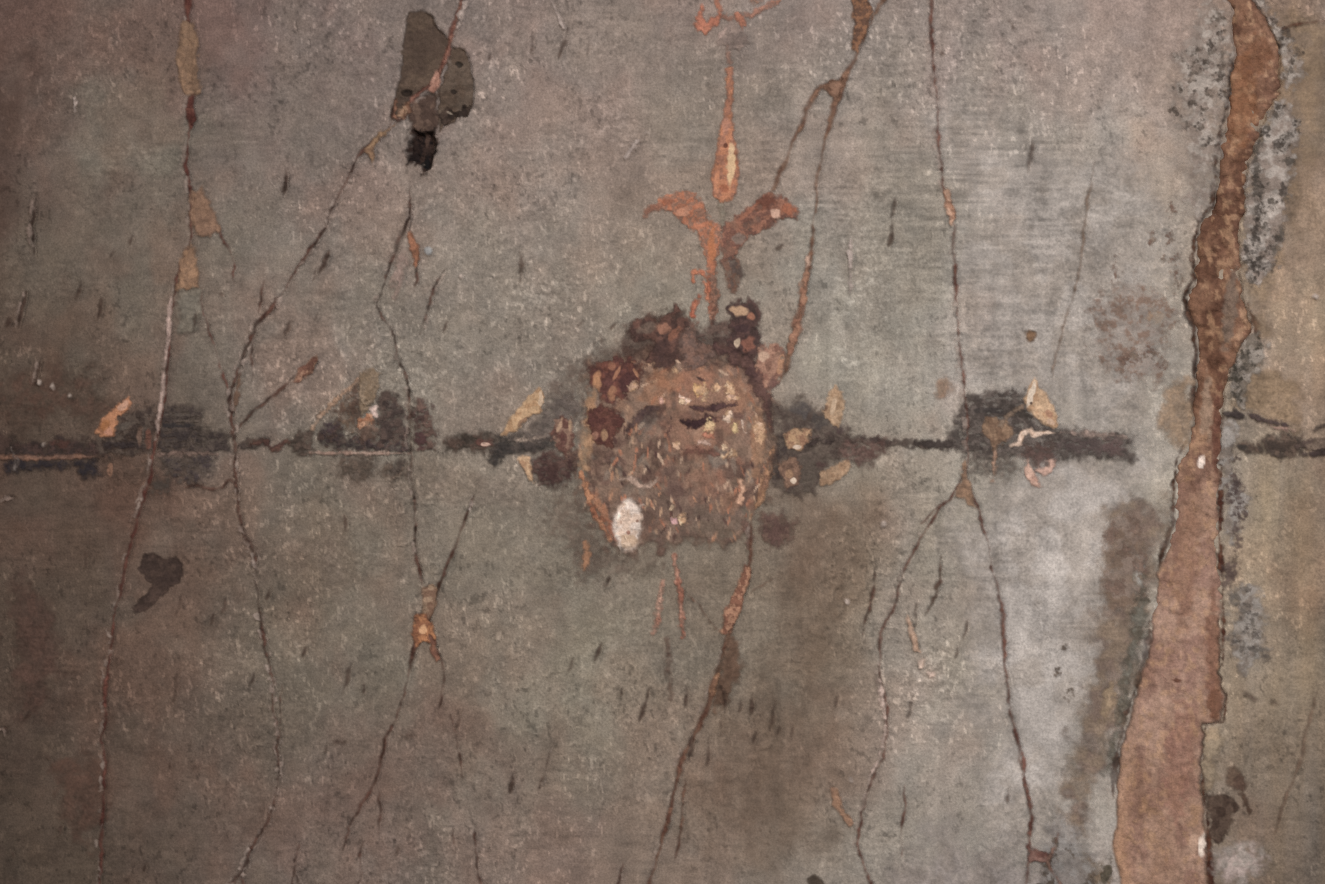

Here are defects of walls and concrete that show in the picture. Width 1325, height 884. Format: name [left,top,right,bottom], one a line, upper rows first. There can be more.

spalling [391,11,474,175]
crack [773,0,886,373]
crack [928,0,936,83]
damp [8,367,116,434]
damp [134,553,183,613]
crack [99,0,472,884]
spalling [613,499,643,550]
crack [617,527,753,884]
crack [856,119,986,884]
crack [990,566,1062,884]
damp [962,447,1147,847]
crack [1111,0,1303,884]